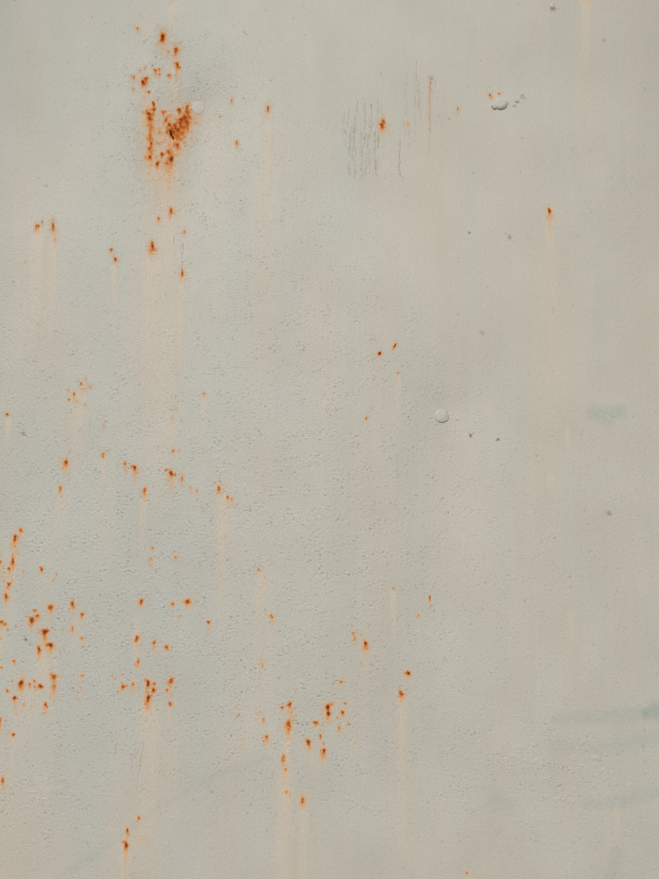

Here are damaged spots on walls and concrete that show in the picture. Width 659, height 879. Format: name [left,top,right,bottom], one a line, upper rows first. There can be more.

rust [104,23,242,314]
rust [374,340,400,361]
rust [119,458,143,488]
rust [161,463,207,515]
rust [0,524,89,797]
rust [109,593,181,879]
rust [236,676,361,794]
rust [401,667,415,688]